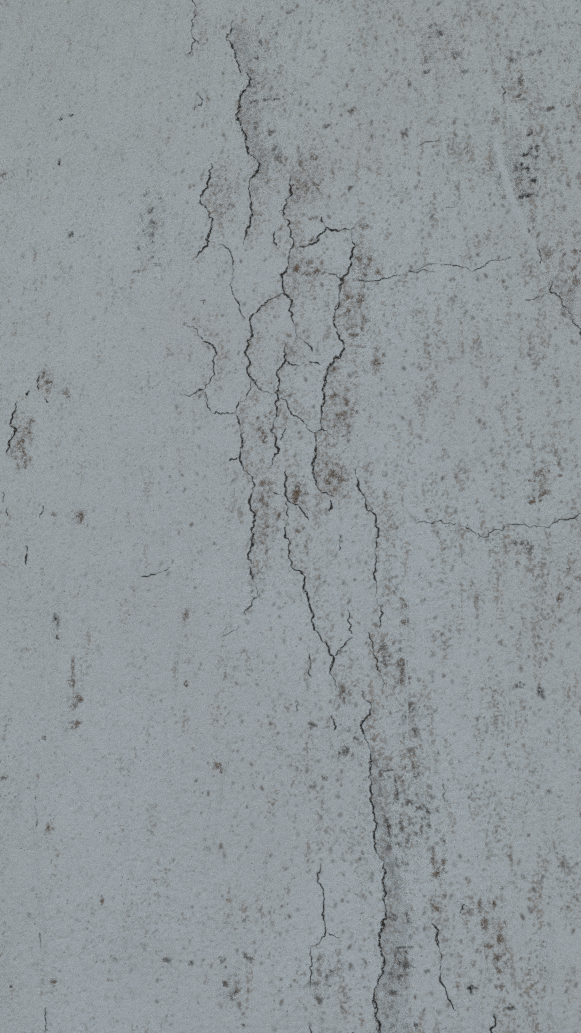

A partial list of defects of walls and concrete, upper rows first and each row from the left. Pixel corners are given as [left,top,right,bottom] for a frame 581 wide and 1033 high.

crack [185,0,198,54]
crack [528,230,581,335]
crack [180,22,510,1033]